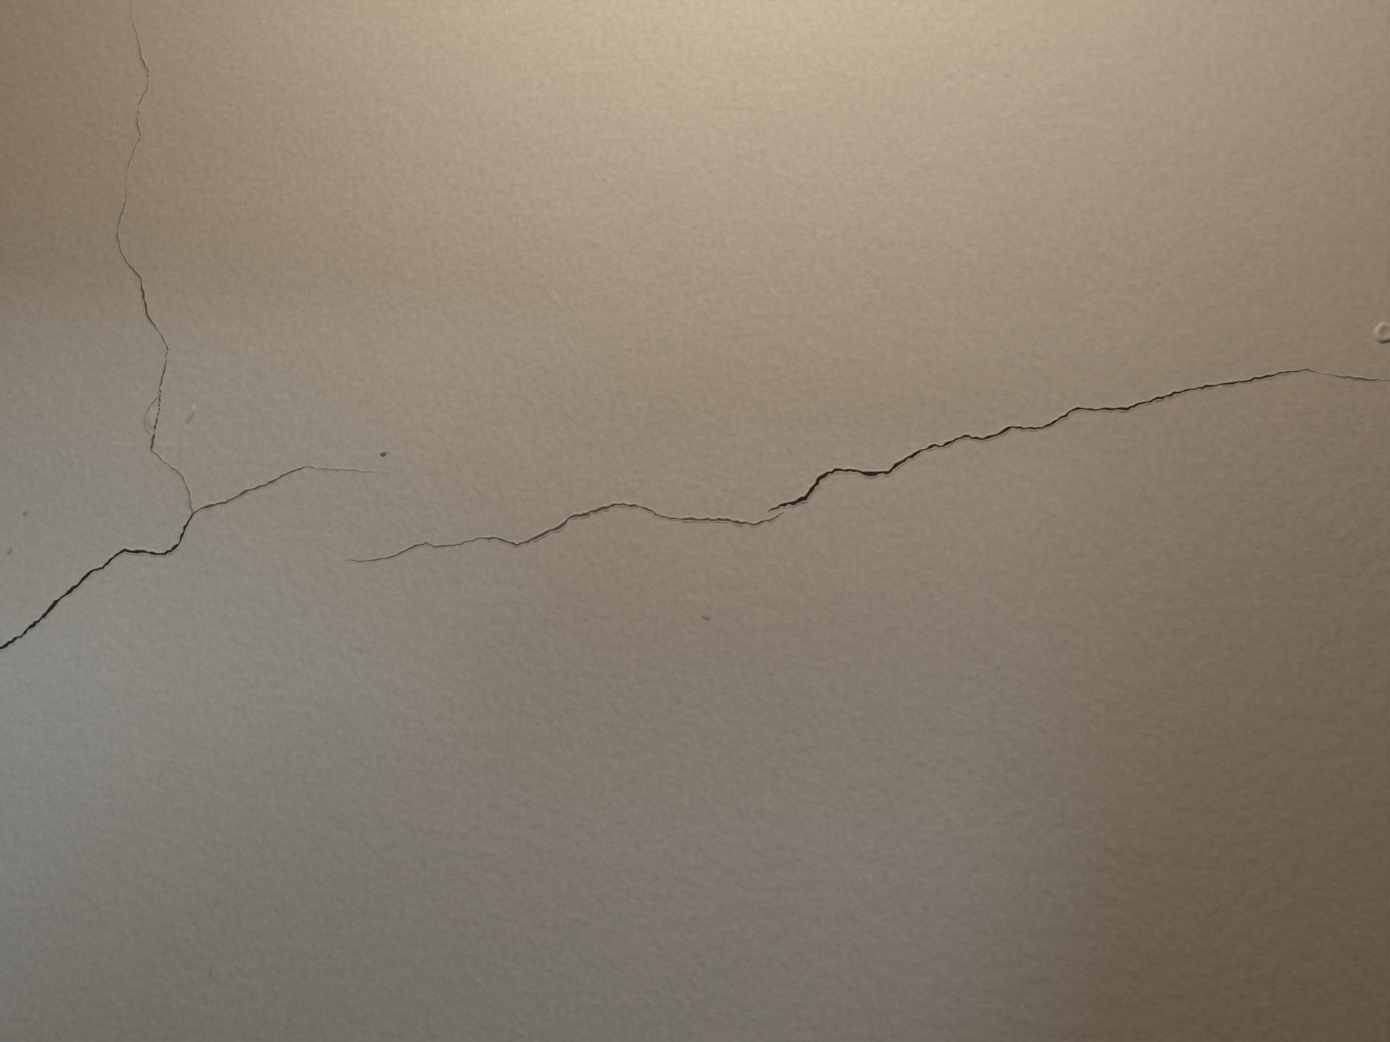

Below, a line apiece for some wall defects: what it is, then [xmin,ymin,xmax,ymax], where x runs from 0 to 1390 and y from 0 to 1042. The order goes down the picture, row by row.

crack [0,0,393,652]
crack [345,367,1390,563]